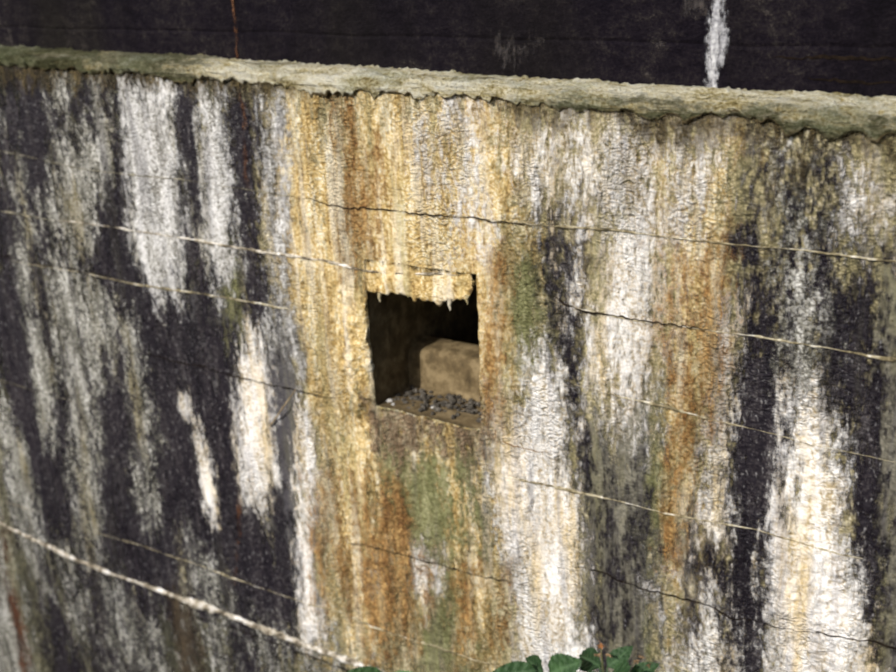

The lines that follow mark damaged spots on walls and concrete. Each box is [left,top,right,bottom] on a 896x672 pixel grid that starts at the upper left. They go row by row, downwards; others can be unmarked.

leakage [706,0,729,88]
rust [328,93,385,290]
leakage [0,65,252,672]
leakage [230,80,896,672]
rust [653,236,731,570]
rust [307,440,437,668]
crack [579,567,896,649]